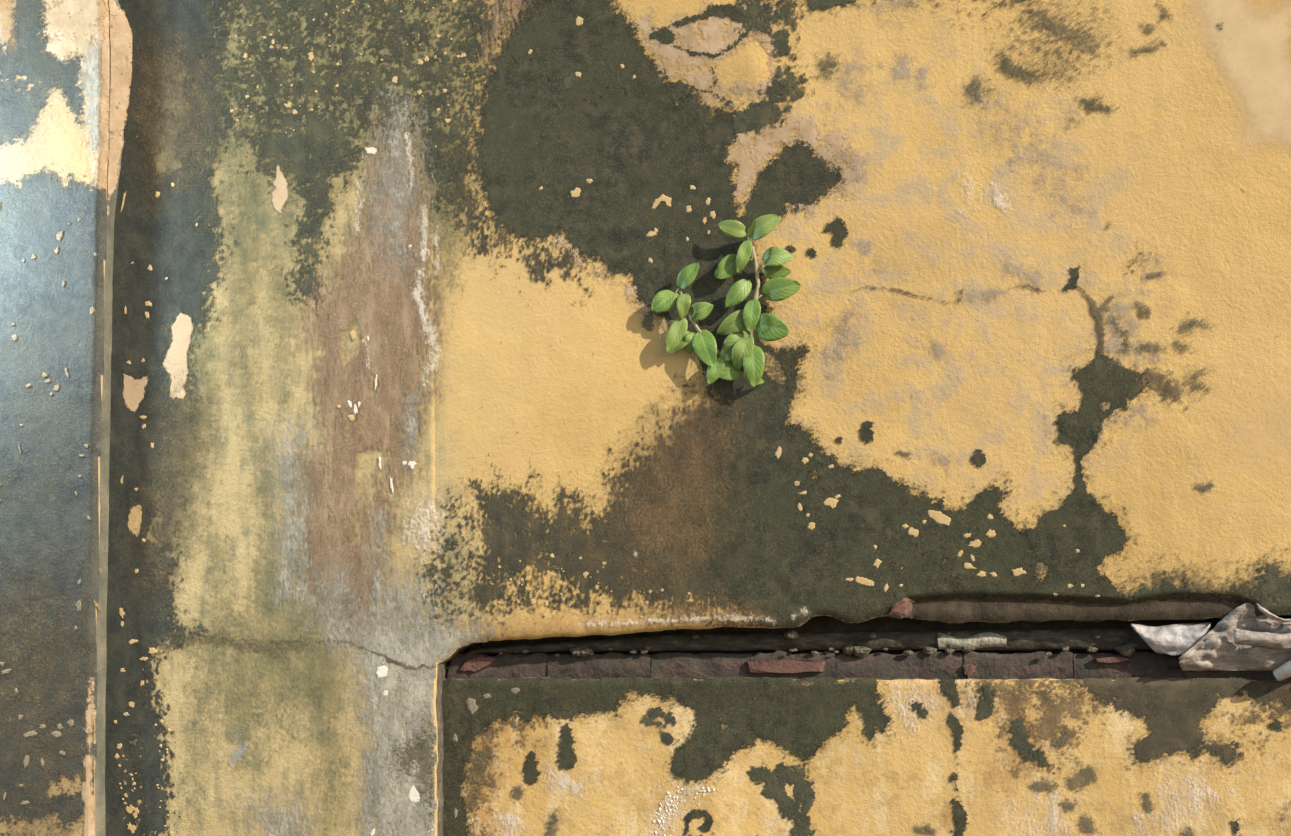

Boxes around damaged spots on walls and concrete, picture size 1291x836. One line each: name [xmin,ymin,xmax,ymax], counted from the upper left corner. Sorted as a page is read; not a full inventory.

peeling [44,0,132,215]
water stain [786,244,817,258]
water stain [822,215,849,250]
crack [852,262,1115,353]
peeling [163,313,193,400]
peeling [122,374,148,412]
water stain [858,421,875,444]
peeling [127,505,142,536]
crack [157,628,436,670]